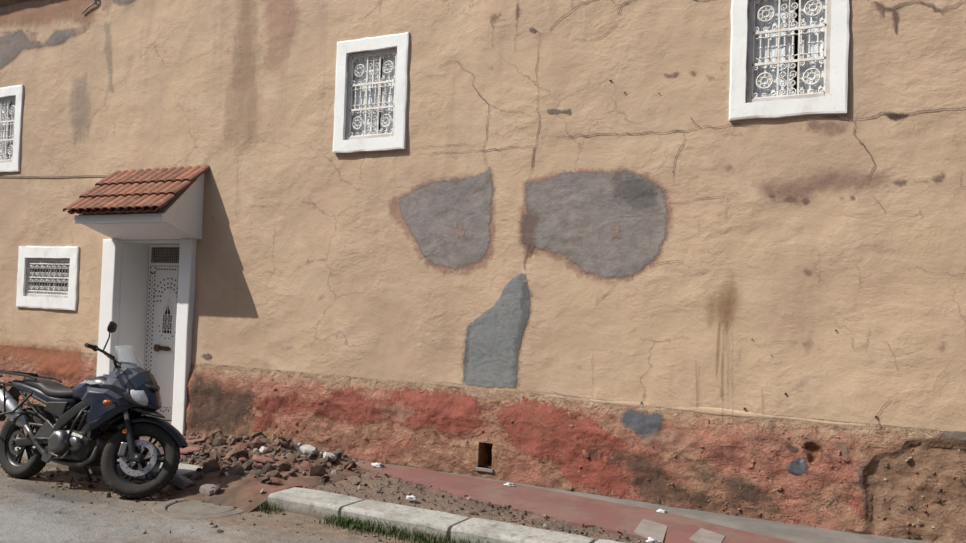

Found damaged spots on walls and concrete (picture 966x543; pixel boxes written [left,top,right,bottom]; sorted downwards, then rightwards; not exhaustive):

peeling [0,25,86,69]
crack [492,0,630,84]
crack [873,0,963,33]
crack [418,60,755,219]
crack [823,107,966,212]
damp [189,376,250,433]
damp [726,478,774,509]
flaking render [837,431,966,543]